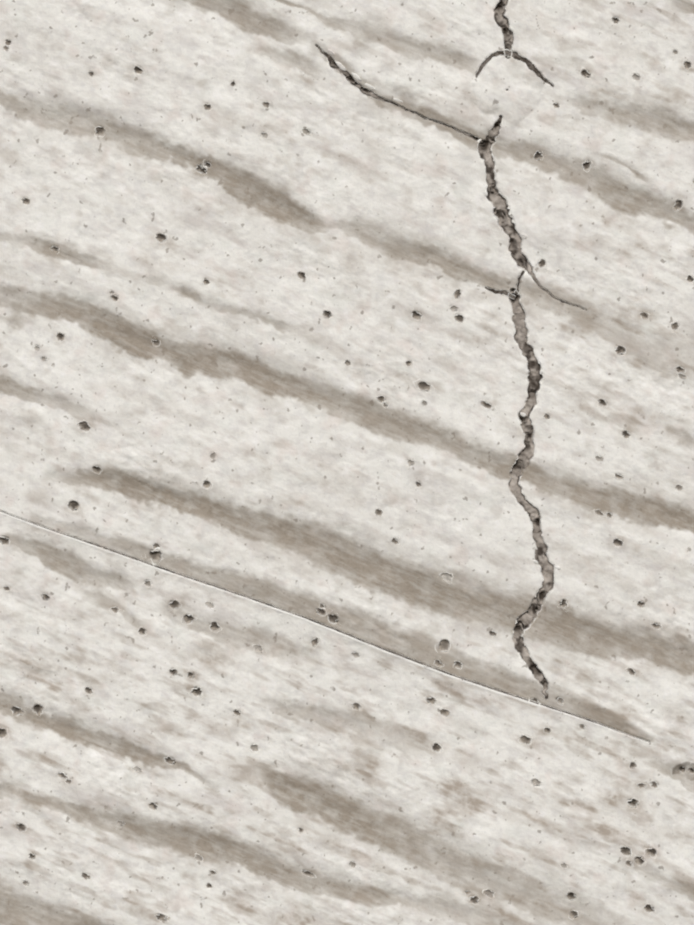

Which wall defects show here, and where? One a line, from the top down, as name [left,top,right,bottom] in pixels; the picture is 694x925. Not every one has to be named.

crack [475,0,554,87]
crack [0,46,650,742]